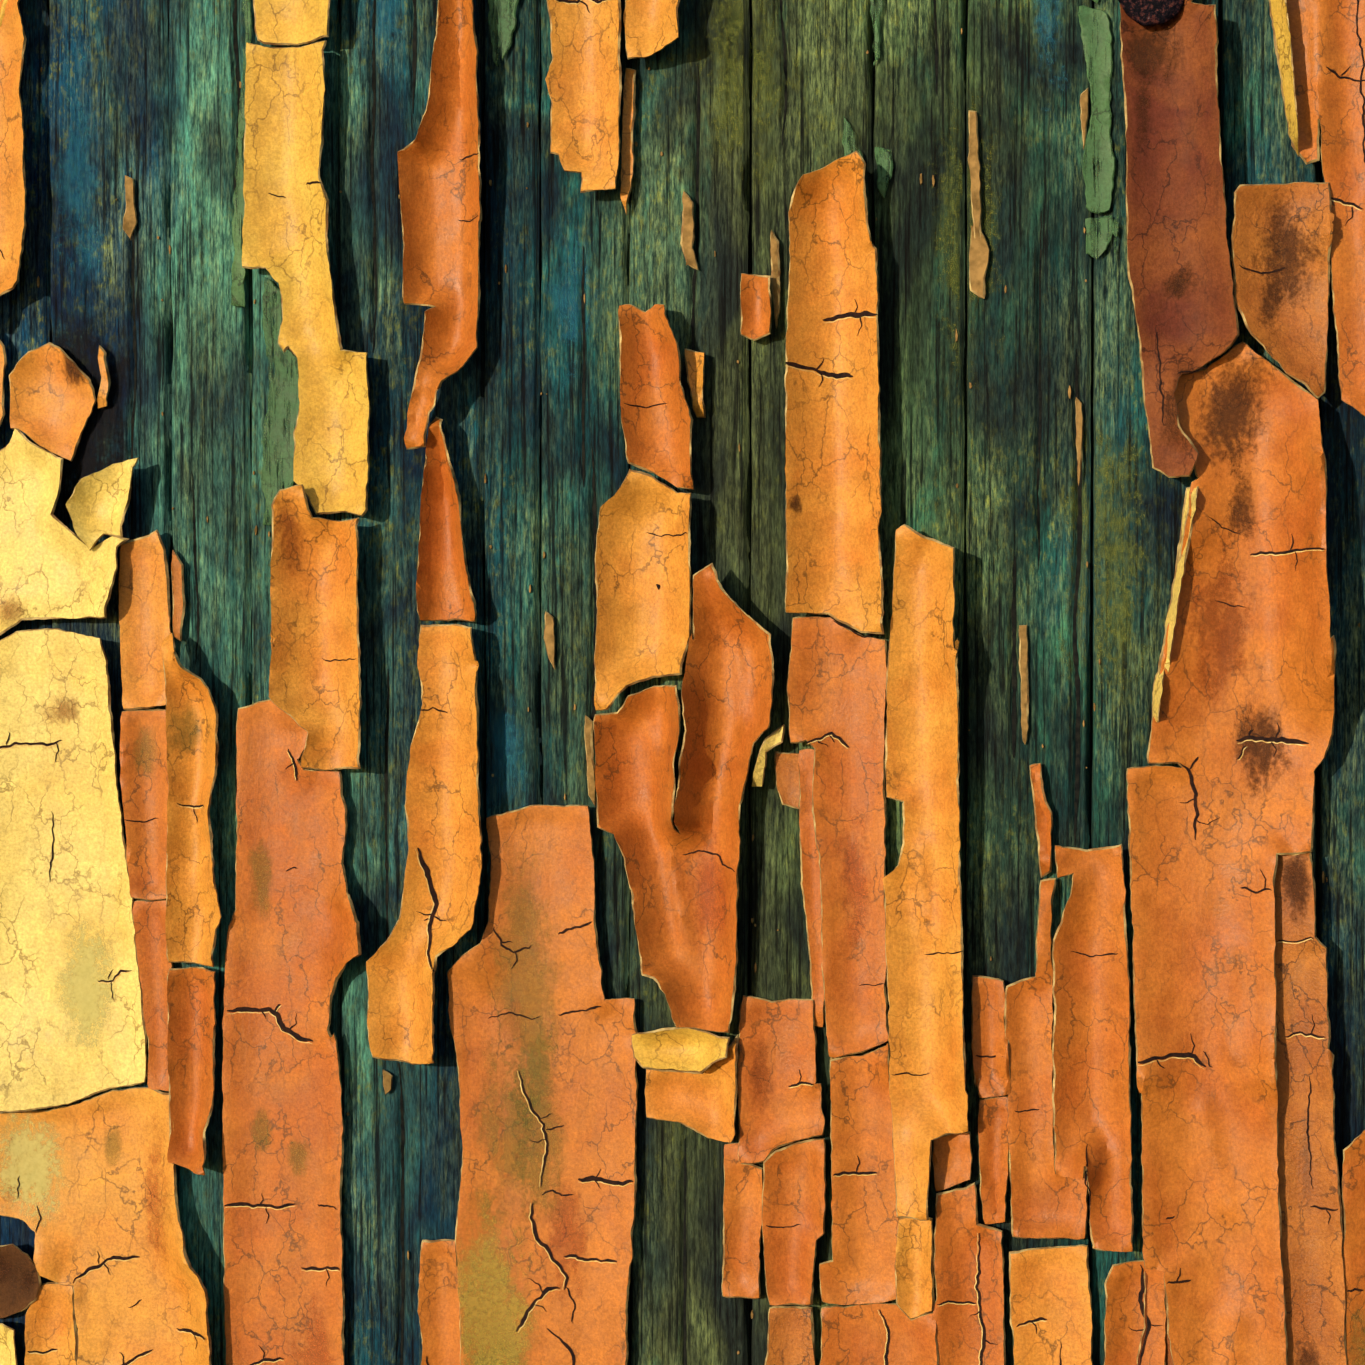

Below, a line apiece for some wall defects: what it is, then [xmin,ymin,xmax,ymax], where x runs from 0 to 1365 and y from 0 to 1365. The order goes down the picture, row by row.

crack [555,0,610,13]
crack [1327,0,1365,163]
crack [823,301,877,335]
crack [785,358,853,386]
peeling [0,0,370,1365]
peeling [366,0,1365,1365]
crack [1236,723,1309,760]
crack [1179,757,1219,840]
crack [415,848,446,974]
crack [227,1004,313,1044]
crack [1138,1033,1211,1069]
crack [516,1071,633,1365]